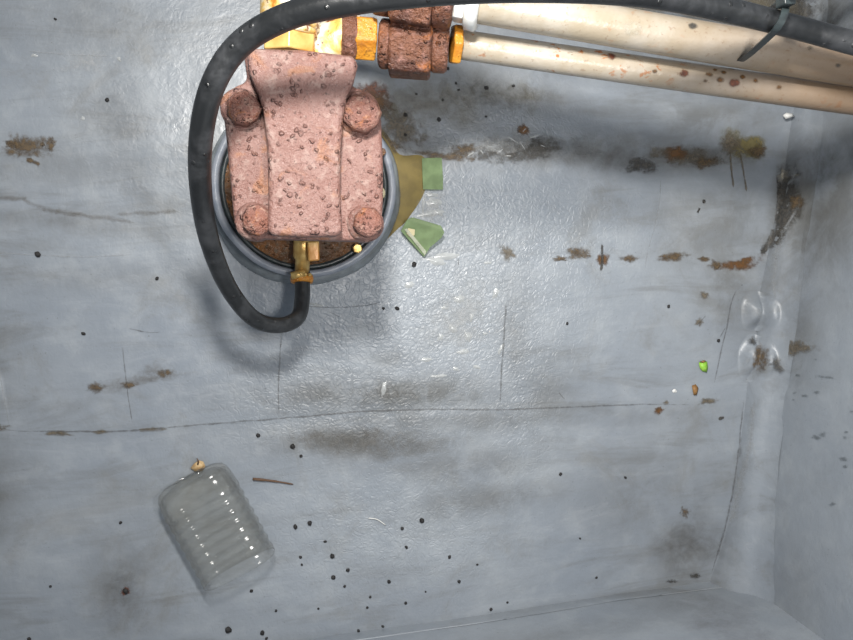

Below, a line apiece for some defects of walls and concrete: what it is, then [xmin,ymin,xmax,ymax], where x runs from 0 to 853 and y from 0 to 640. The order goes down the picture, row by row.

rust [6,138,55,165]
rust [629,147,716,172]
rust [761,169,803,253]
rust [554,245,609,270]
rust [659,253,682,261]
rust [698,256,753,270]